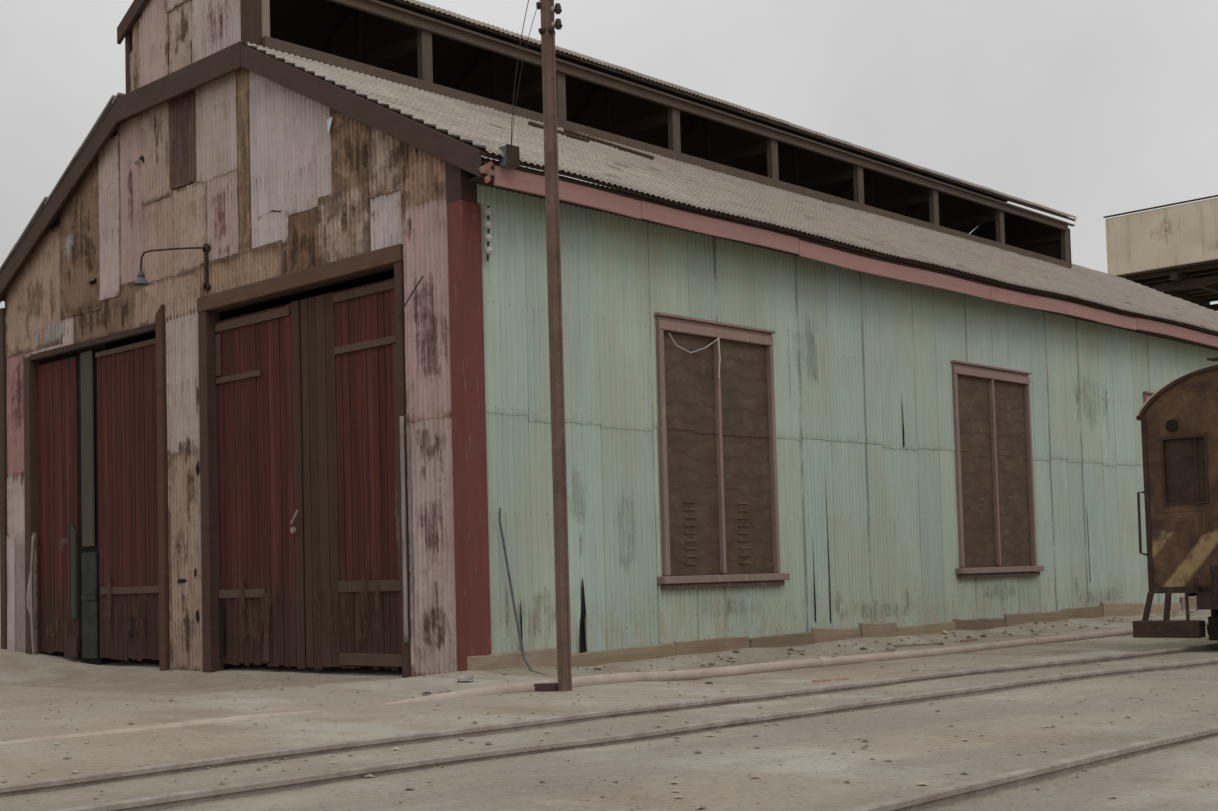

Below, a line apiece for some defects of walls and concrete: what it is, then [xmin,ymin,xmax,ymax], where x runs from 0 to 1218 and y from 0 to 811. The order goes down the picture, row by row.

corrosion [19,201,95,332]
corrosion [284,226,326,273]
corrosion [79,298,128,333]
corrosion [179,438,194,510]
corrosion [182,585,193,657]
corrosion [424,582,444,646]
crack [579,577,587,653]